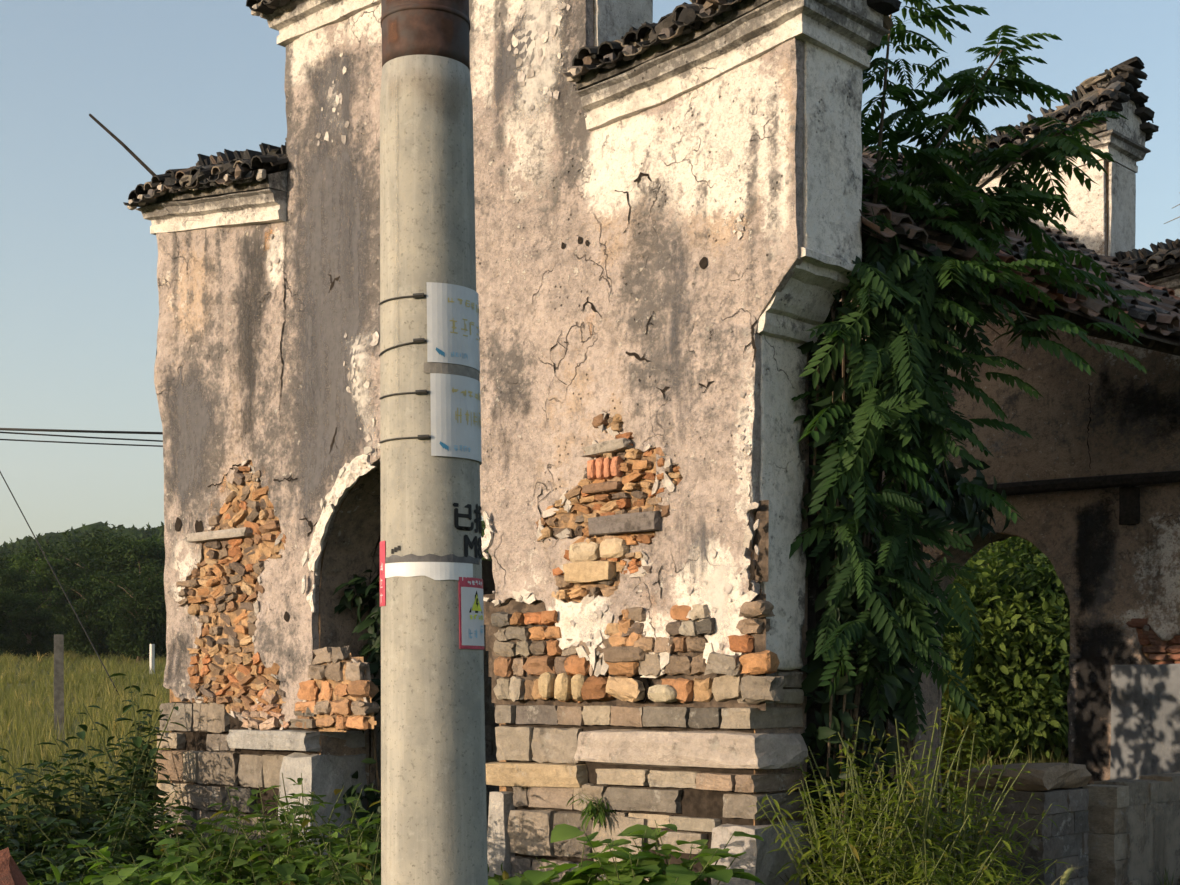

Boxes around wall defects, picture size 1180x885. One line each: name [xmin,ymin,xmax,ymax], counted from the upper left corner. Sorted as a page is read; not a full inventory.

leakage [494,17,535,110]
leakage [239,246,265,435]
leakage [296,56,369,537]
crack [548,297,601,394]
crack [615,172,651,232]
crack [626,315,670,398]
crack [743,318,757,367]
spalling [176,460,380,732]
peeling [301,331,380,613]
peeling [481,511,494,559]
spalling [483,411,785,711]
leakage [1074,500,1133,788]